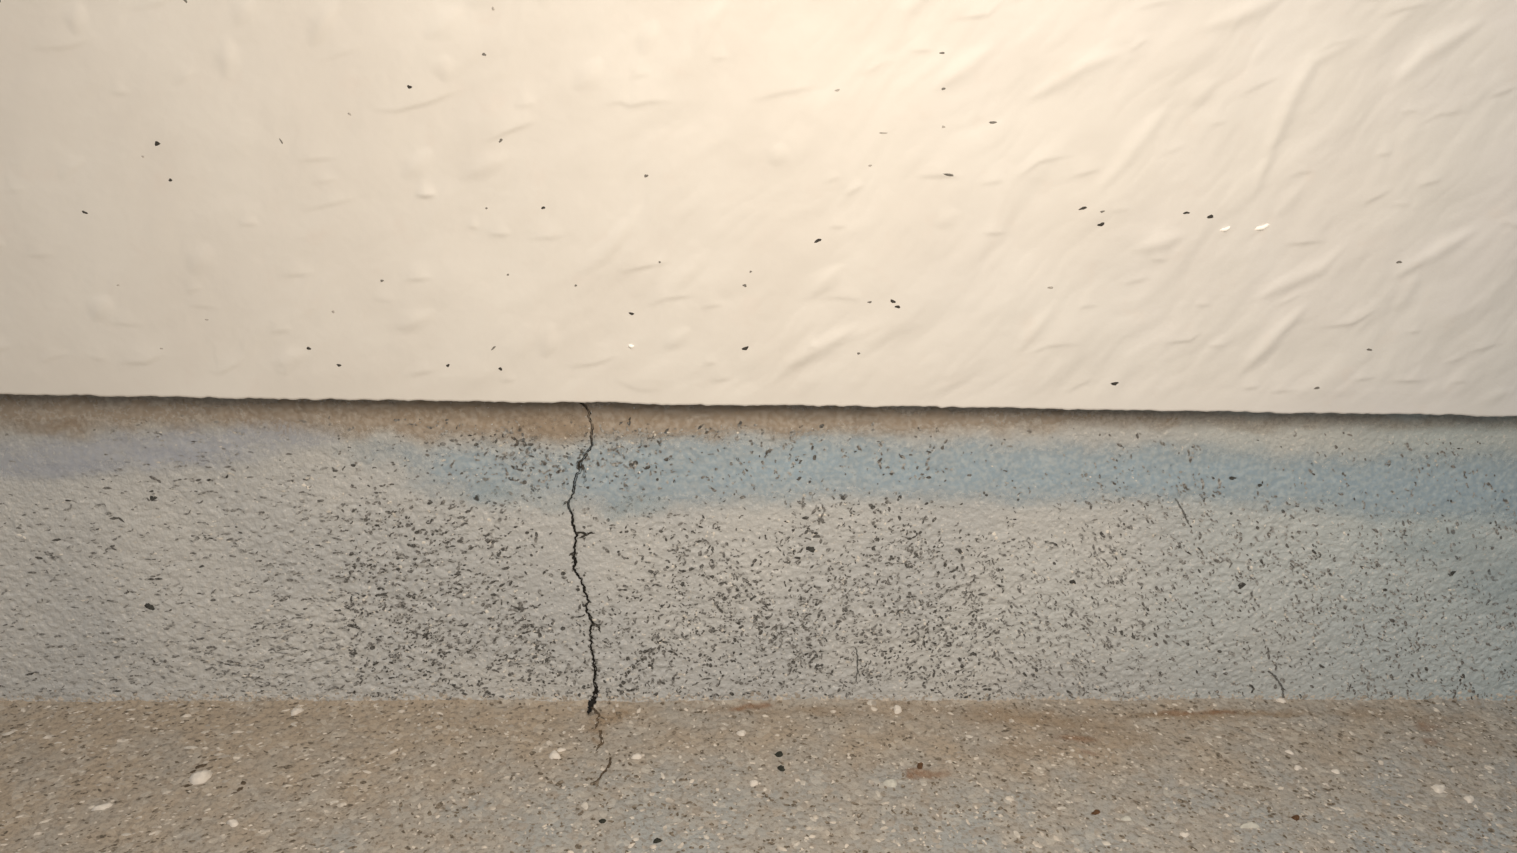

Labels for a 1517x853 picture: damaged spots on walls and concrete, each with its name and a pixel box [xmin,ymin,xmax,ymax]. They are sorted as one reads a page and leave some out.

crack [563,403,612,785]